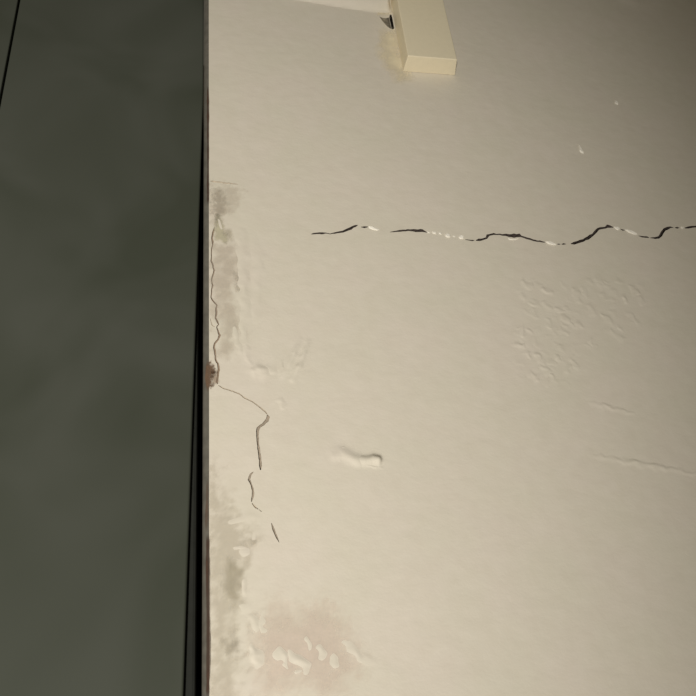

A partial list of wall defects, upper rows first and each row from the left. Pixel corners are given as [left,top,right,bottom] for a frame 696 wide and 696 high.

crack [312,225,696,245]
rust [205,362,216,388]
crack [210,227,279,542]